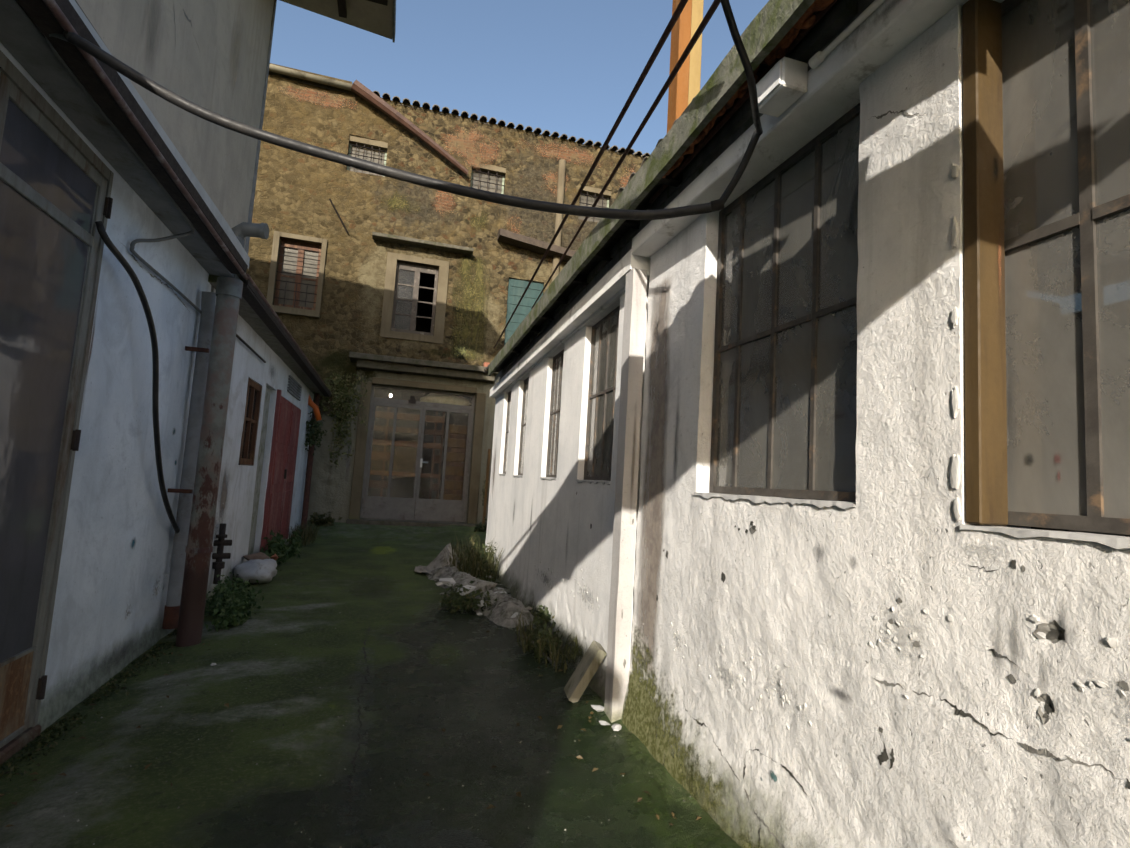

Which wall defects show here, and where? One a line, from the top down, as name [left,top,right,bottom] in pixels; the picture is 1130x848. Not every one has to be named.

crack [872,110,926,119]
peeling [869,597,925,658]
spalling [1029,615,1065,643]
spalling [1033,688,1055,725]
peeling [1075,680,1130,712]
crack [873,678,1130,789]